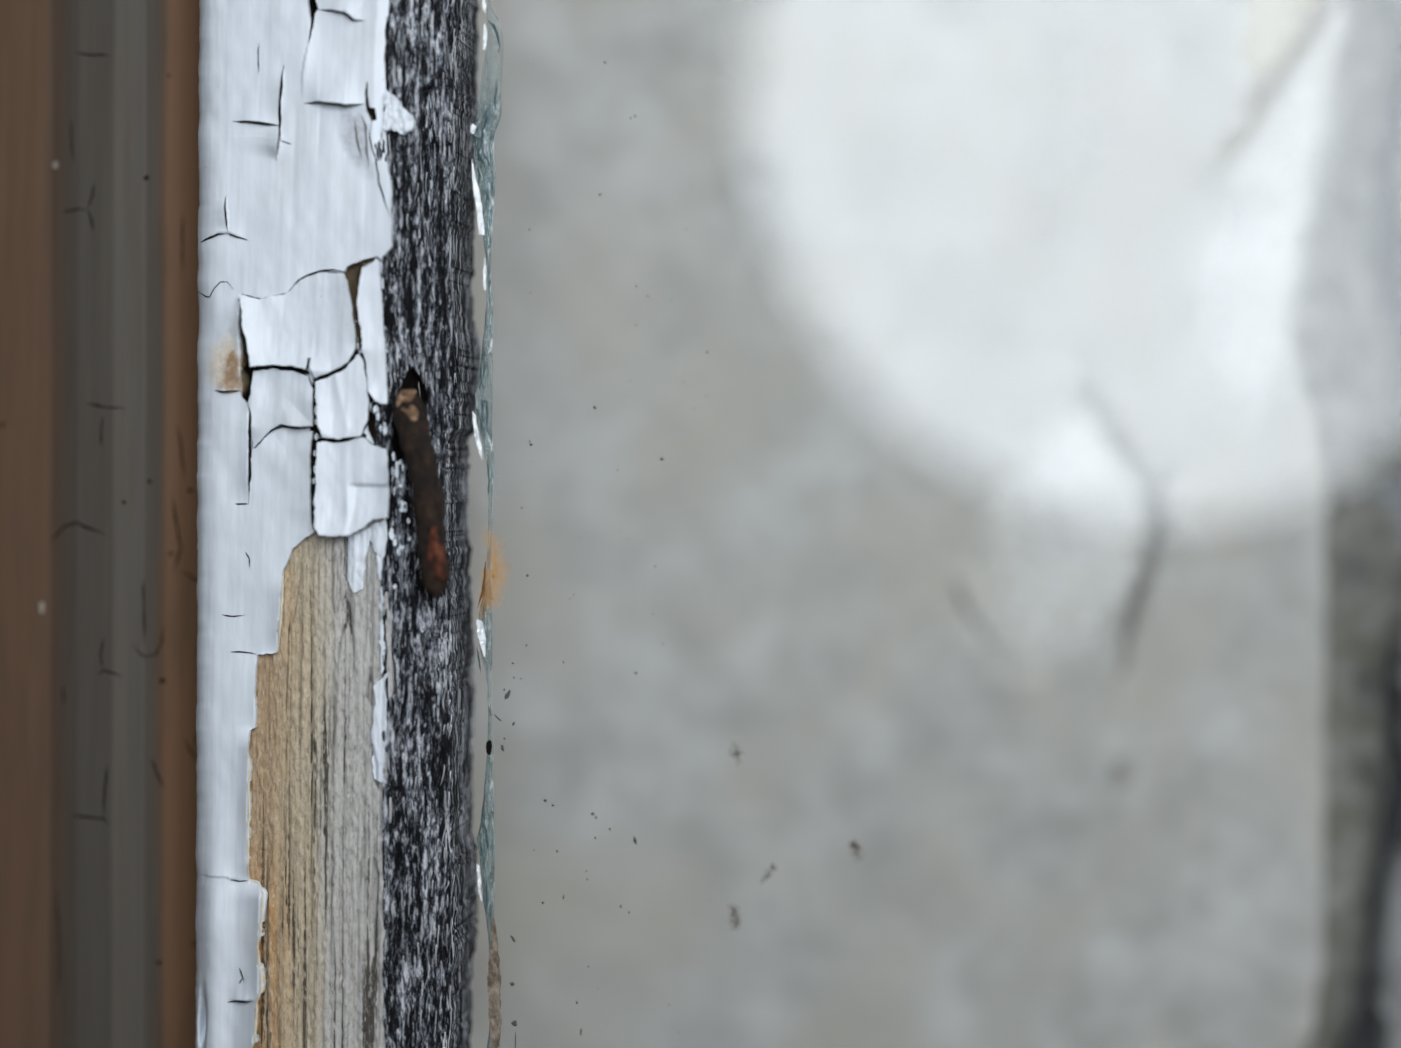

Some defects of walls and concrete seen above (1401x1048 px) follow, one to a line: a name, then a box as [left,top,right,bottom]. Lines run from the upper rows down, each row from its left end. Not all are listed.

crack [308,9,366,43]
crack [233,46,391,217]
crack [181,196,249,298]
crack [280,269,344,295]
crack [215,365,377,510]
rust [426,527,447,581]
rust [477,553,498,609]
peeling [239,259,395,1048]